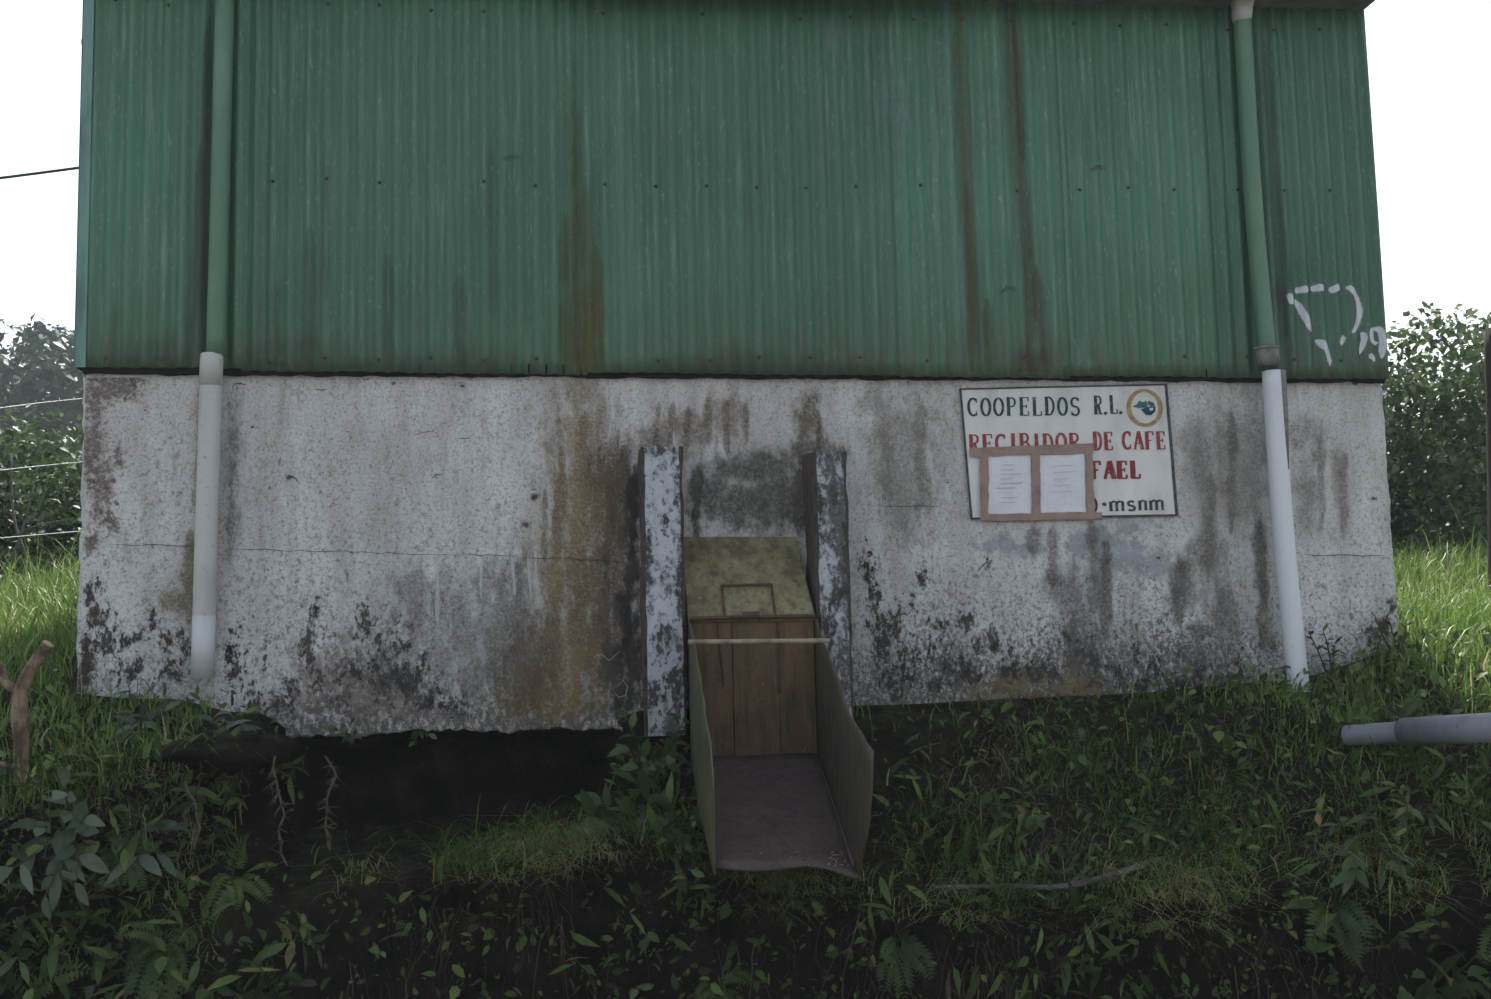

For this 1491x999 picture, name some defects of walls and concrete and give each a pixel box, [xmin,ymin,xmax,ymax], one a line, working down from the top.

water stain [77,530,194,695]
water stain [222,596,469,719]
rust [511,382,607,721]
peeling [642,440,686,738]
water stain [691,466,704,537]
peeling [815,447,850,647]
water stain [856,522,1276,705]
water stain [1359,596,1398,661]